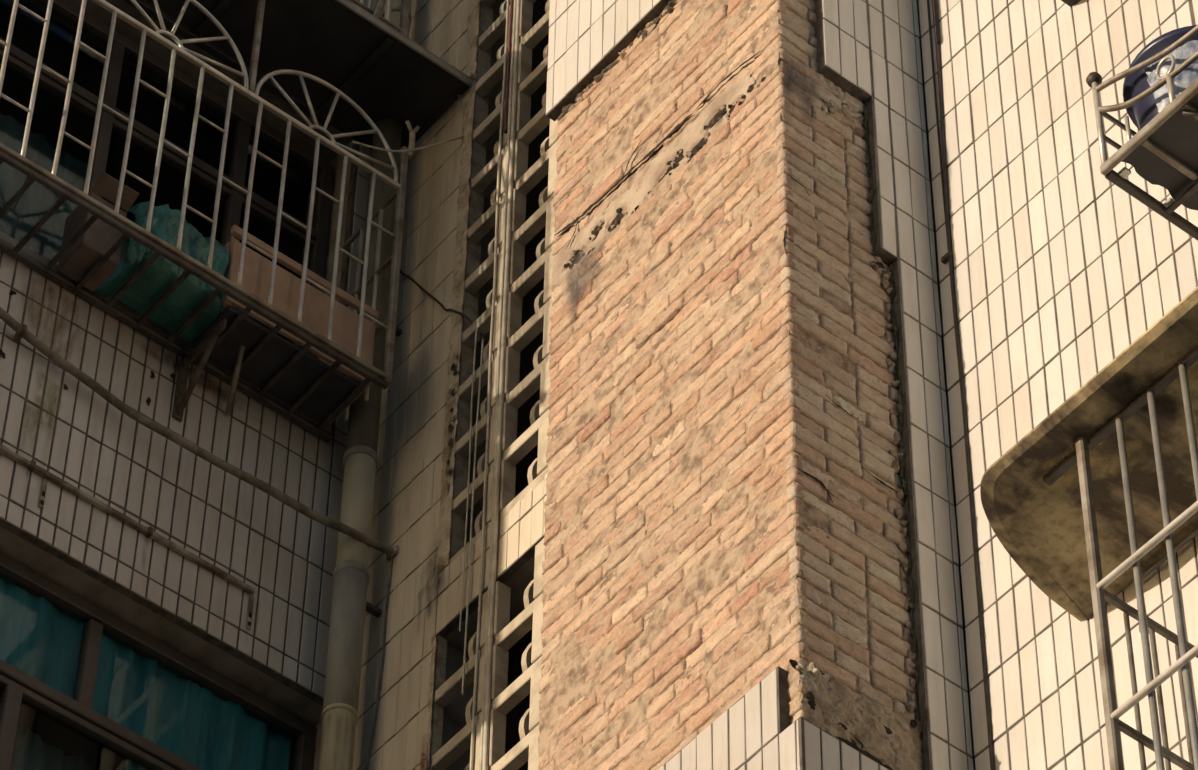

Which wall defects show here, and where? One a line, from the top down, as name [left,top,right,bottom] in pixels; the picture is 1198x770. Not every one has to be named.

water stain [1116,377,1176,414]
spalling [789,650,923,770]